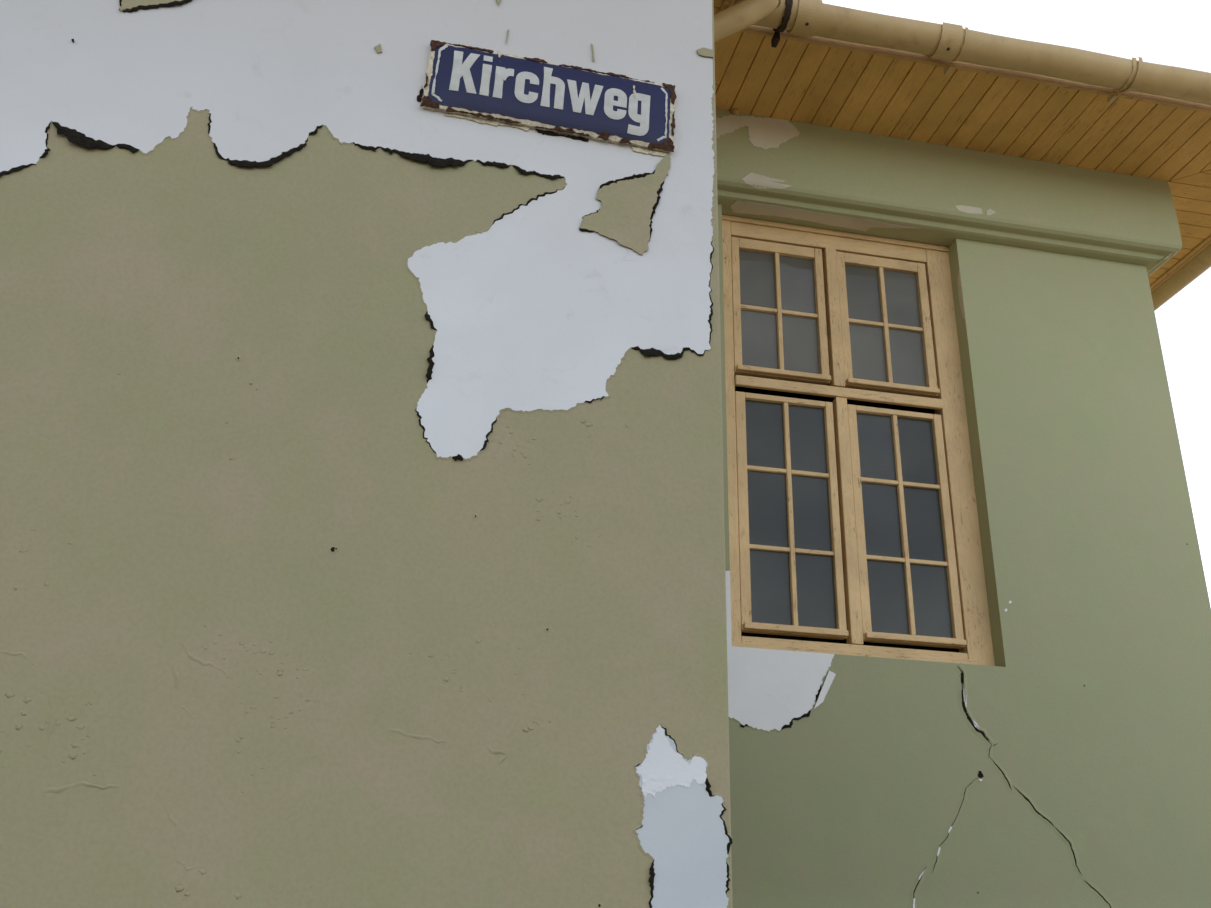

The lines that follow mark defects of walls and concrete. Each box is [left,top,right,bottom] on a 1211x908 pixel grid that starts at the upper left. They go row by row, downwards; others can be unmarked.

peeling [0,0,802,462]
peeling [725,571,836,734]
peeling [632,723,733,908]
crack [907,663,1114,908]